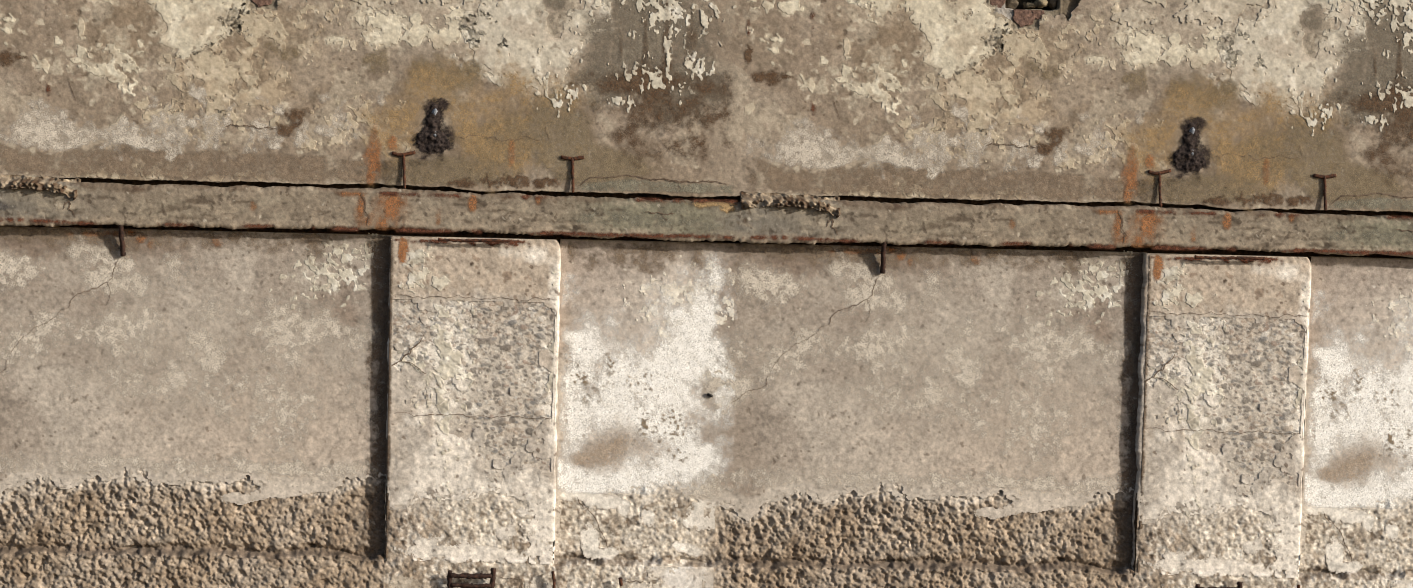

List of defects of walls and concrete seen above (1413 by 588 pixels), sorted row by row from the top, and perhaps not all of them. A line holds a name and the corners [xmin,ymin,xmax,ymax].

peeling [0,13,16,46]
leakage [0,0,732,193]
peeling [34,0,805,169]
leakage [744,0,1413,209]
peeling [799,0,1413,184]
peeling [269,222,392,310]
corrosion [332,134,451,263]
corrosion [636,198,737,213]
corrosion [467,230,910,261]
corrosion [1090,153,1413,280]
flaking render [0,238,1413,588]